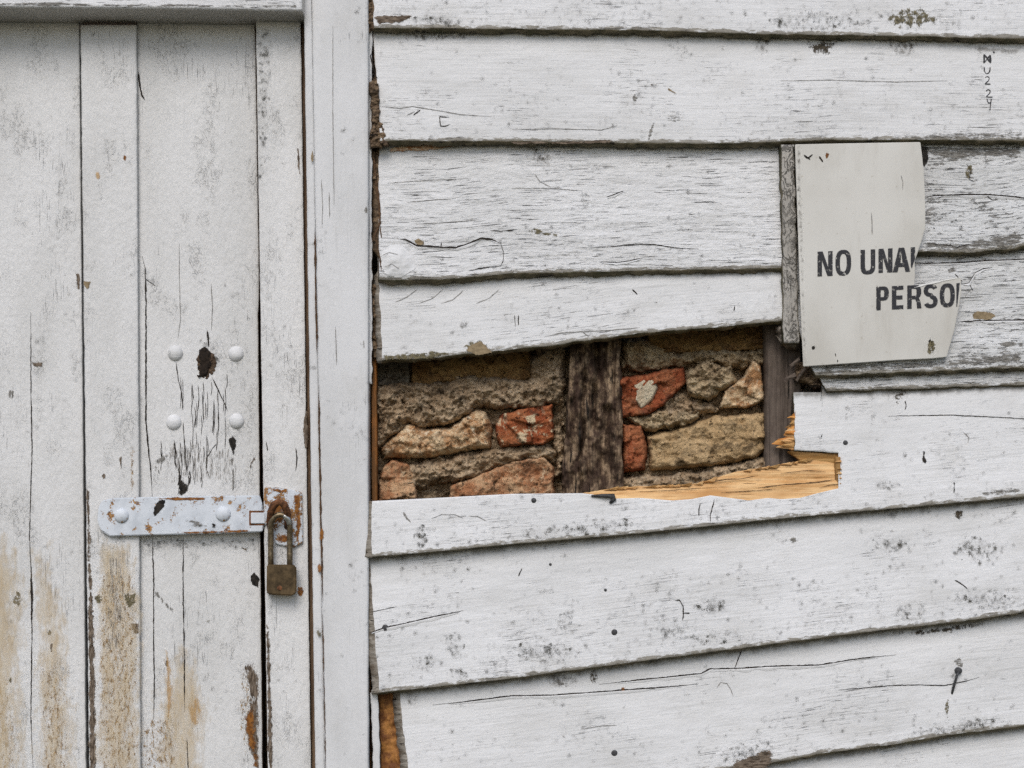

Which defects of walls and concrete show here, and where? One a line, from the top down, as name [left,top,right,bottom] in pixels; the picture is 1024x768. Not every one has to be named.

crack [371,149,517,303]
peeling [384,351,448,360]
peeling [467,341,491,355]
spalling [634,380,658,408]
corrosion [273,489,301,543]
peeling [85,489,140,768]
crack [370,607,463,633]
crack [436,650,891,705]
crack [844,677,978,690]
corrosion [245,710,258,768]